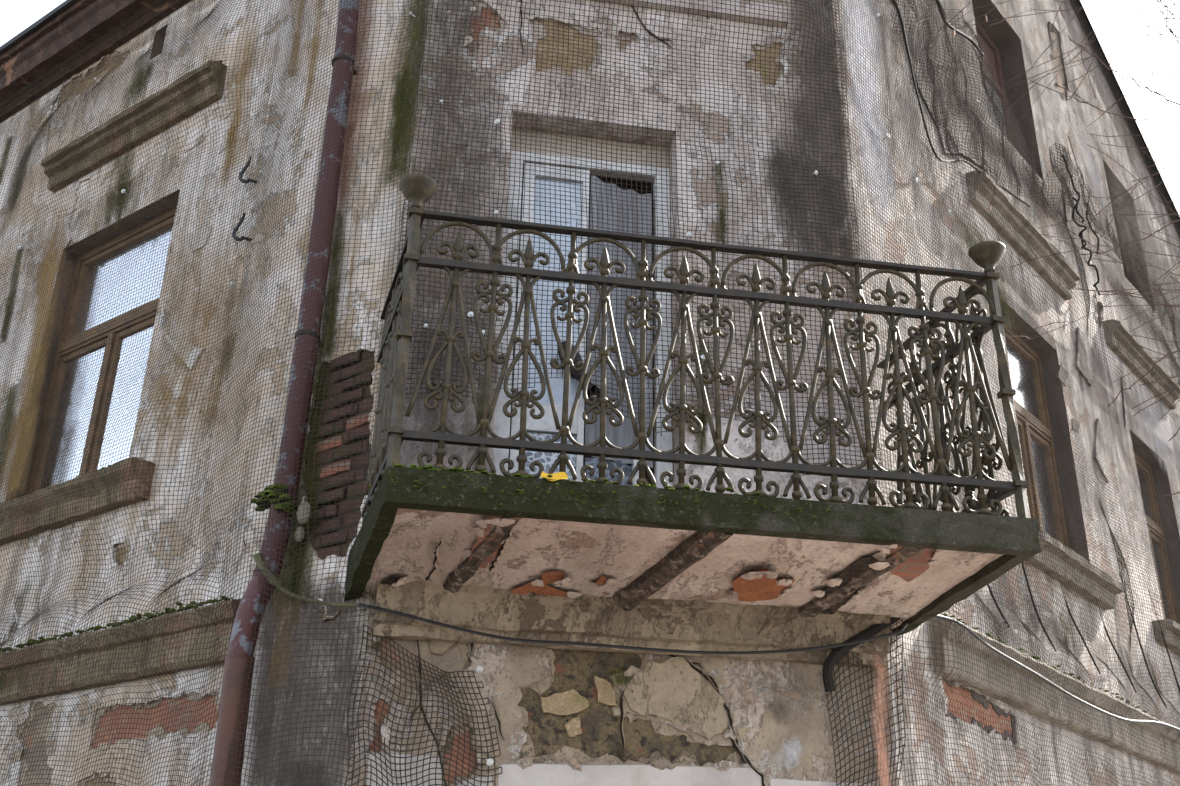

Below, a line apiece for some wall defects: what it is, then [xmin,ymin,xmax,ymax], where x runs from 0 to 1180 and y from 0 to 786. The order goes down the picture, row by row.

flaking render [525,13,641,78]
leakage [399,0,493,464]
flaking render [301,350,381,560]
flaking render [461,515,515,568]
flaking render [728,568,796,602]
flaking render [808,544,945,614]
flaking render [18,702,59,786]
flaking render [91,686,219,754]
flaking render [513,648,747,772]
crack [620,687,652,761]
crack [670,655,767,786]
flaking render [940,678,1019,750]